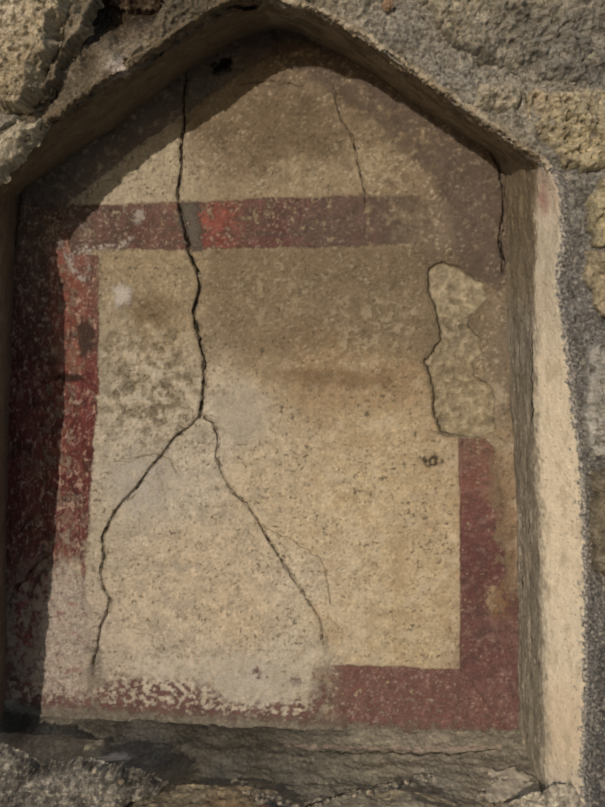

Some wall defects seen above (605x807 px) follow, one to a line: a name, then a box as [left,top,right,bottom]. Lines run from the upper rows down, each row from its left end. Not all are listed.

crack [333,87,366,203]
crack [91,72,330,675]
flaking render [421,259,496,438]
crack [304,777,417,807]
crack [299,748,502,756]